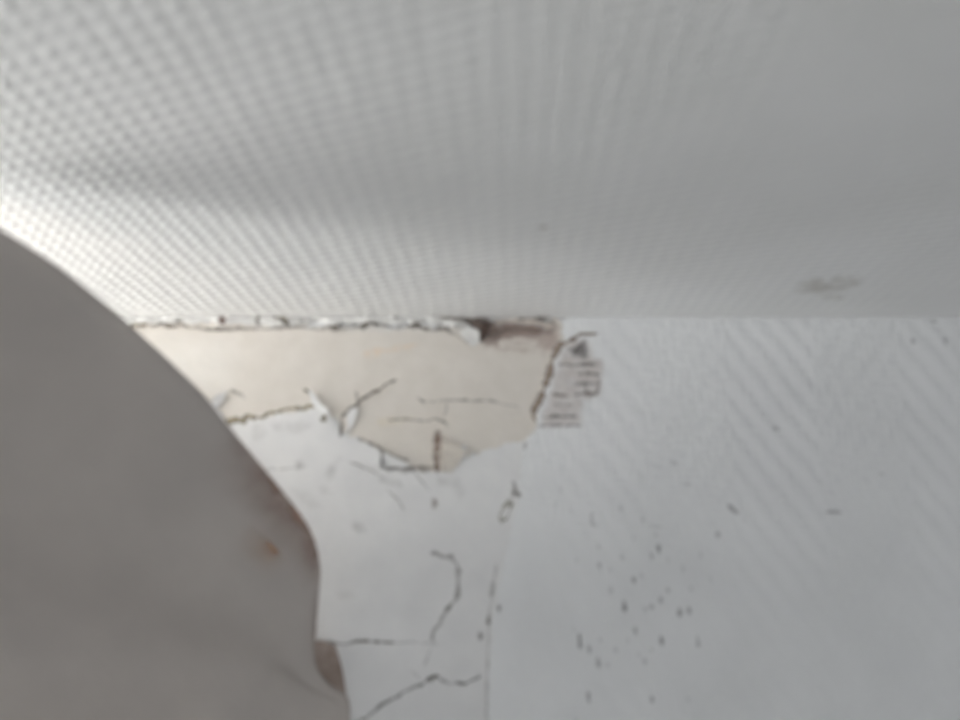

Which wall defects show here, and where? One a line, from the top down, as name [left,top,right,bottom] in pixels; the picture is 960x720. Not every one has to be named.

crack [131,321,185,329]
crack [226,316,303,330]
crack [329,316,479,331]
crack [226,380,396,435]
crack [391,400,491,472]
peeling [0,230,552,720]
crack [331,638,393,646]
crack [360,674,479,720]